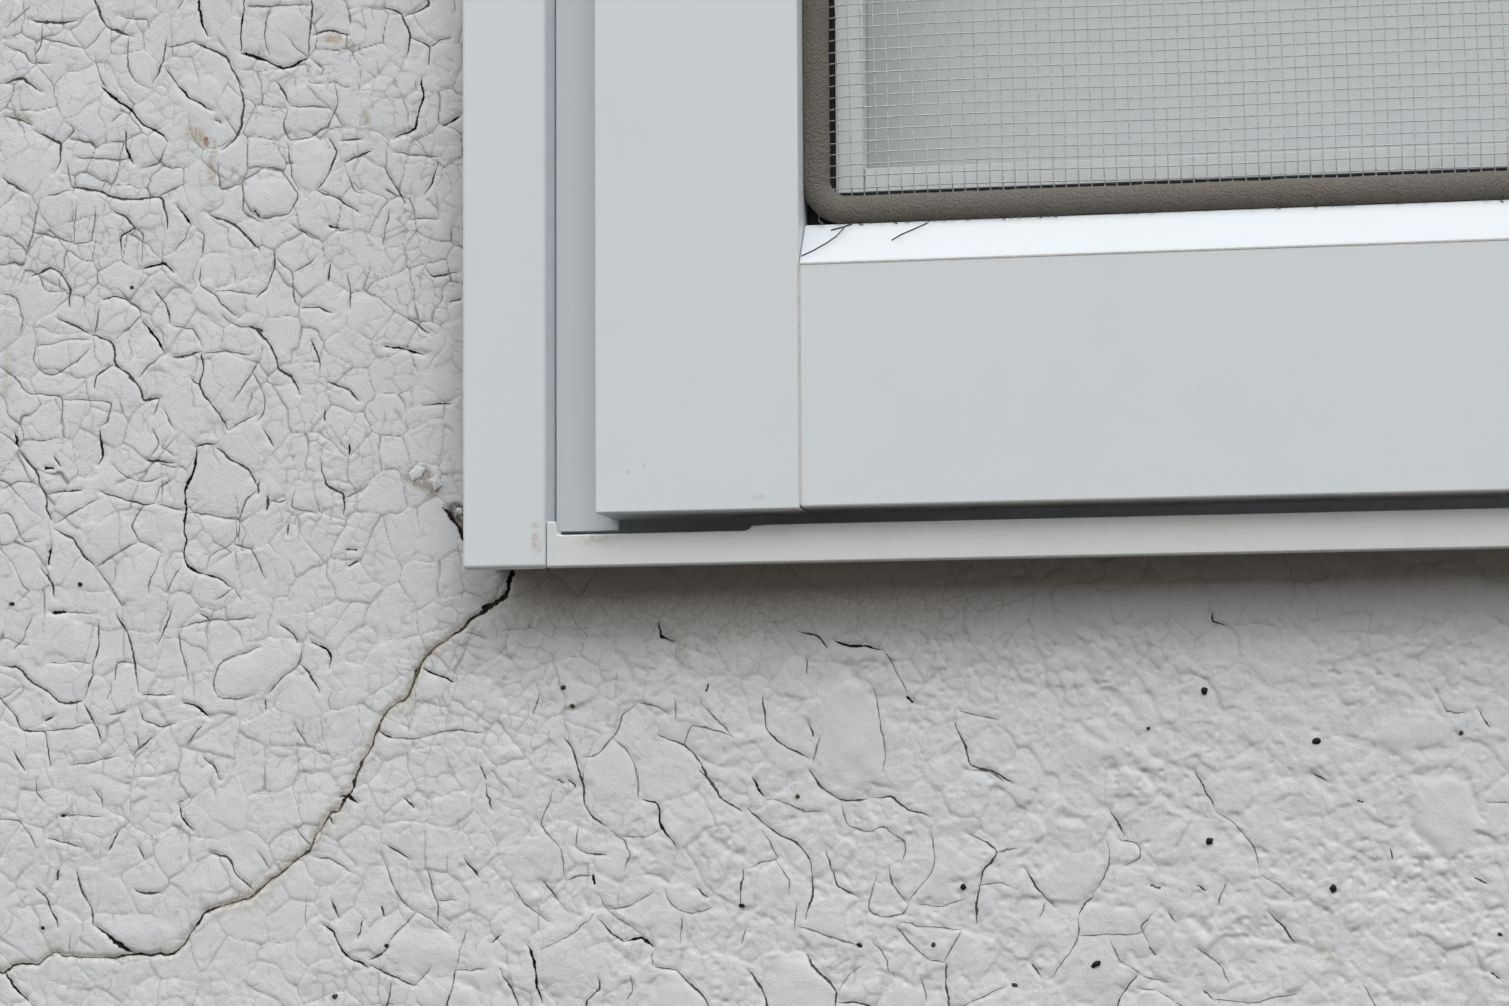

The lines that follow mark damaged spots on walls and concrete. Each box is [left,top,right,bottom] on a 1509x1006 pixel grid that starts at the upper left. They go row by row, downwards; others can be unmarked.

crack [0,0,515,1006]